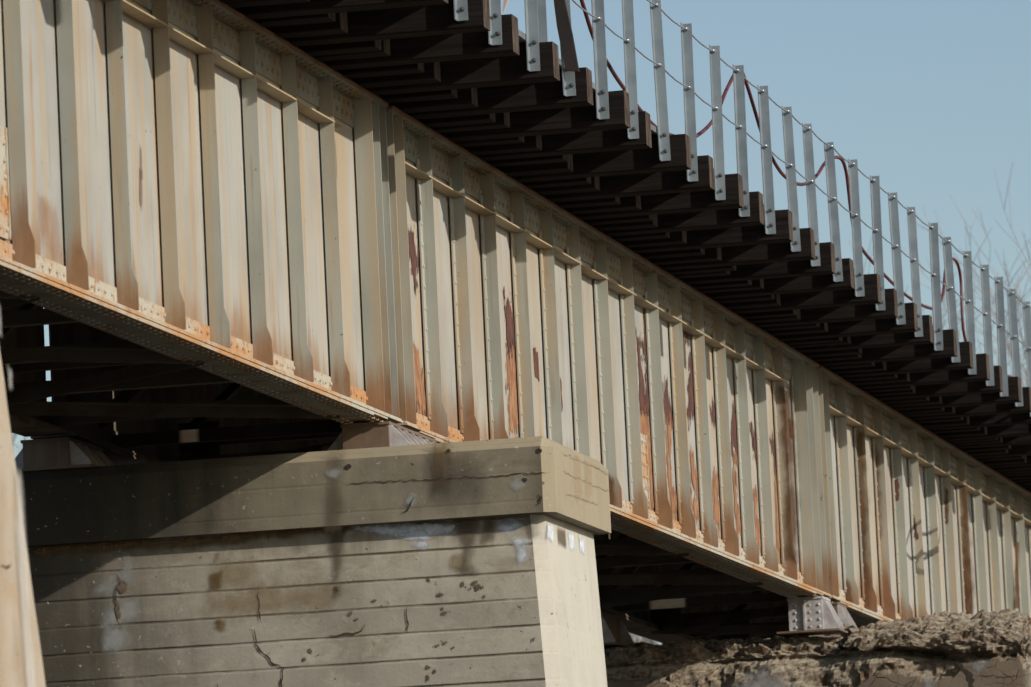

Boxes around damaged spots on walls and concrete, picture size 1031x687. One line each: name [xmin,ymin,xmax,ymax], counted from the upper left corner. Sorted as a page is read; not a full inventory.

rust [413,344,427,417]
rust [506,348,520,438]
water stain [332,518,527,575]
crack [344,454,609,514]
rust [639,405,655,511]
rust [712,466,720,530]
rust [731,449,742,536]
rust [753,484,762,551]
rust [774,387,798,561]
crack [114,574,127,630]
crack [250,594,284,687]
crack [957,662,1018,687]